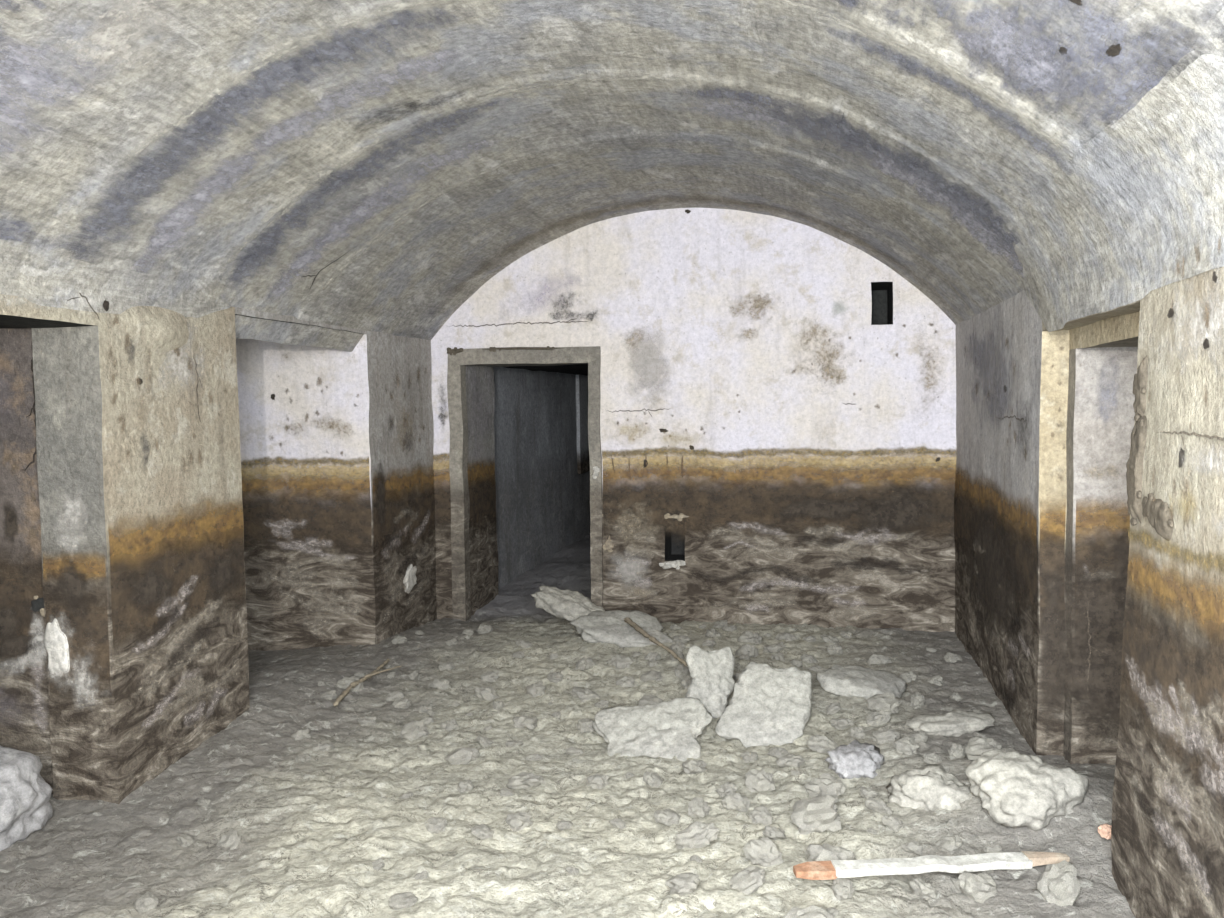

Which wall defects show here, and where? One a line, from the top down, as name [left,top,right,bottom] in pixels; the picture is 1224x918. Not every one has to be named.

water stain [467,462,496,529]
water stain [1135,791,1224,918]